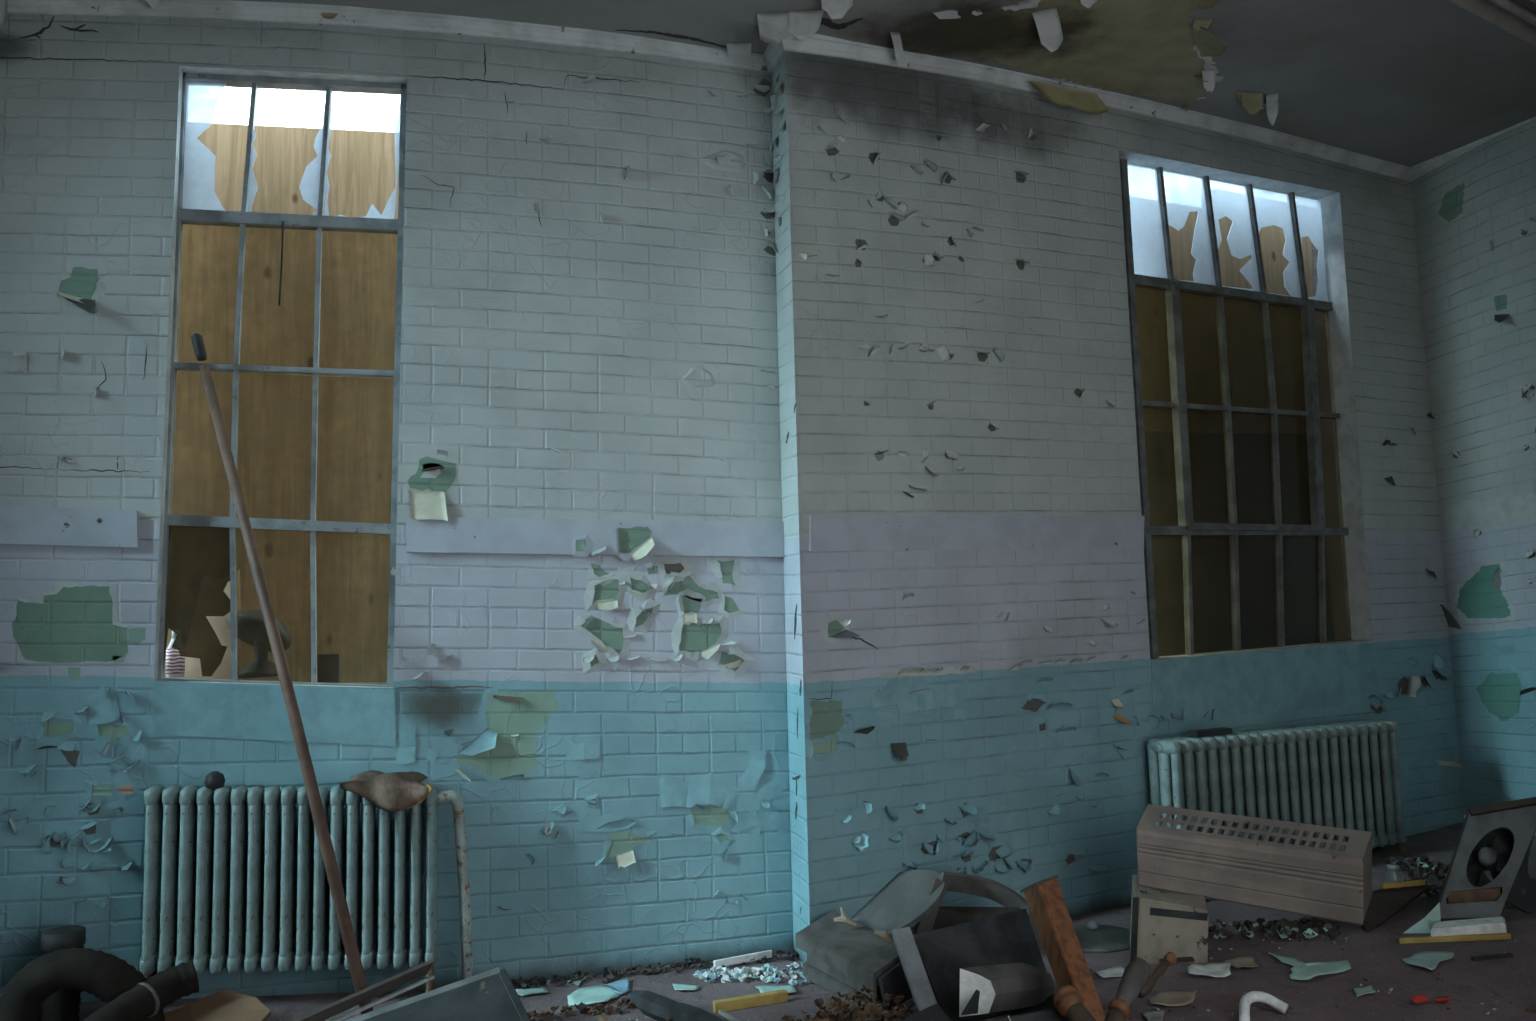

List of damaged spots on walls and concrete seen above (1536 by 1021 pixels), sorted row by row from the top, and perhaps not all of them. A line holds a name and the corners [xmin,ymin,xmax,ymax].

peeling [616,0,863,63]
peeling [881,0,1279,126]
peeling [54,267,107,314]
peeling [12,581,146,680]
peeling [571,522,754,680]
peeling [1440,558,1515,630]
peeling [19,685,142,774]
peeling [396,688,558,784]
peeling [1476,644,1536,728]
peeling [540,751,789,869]